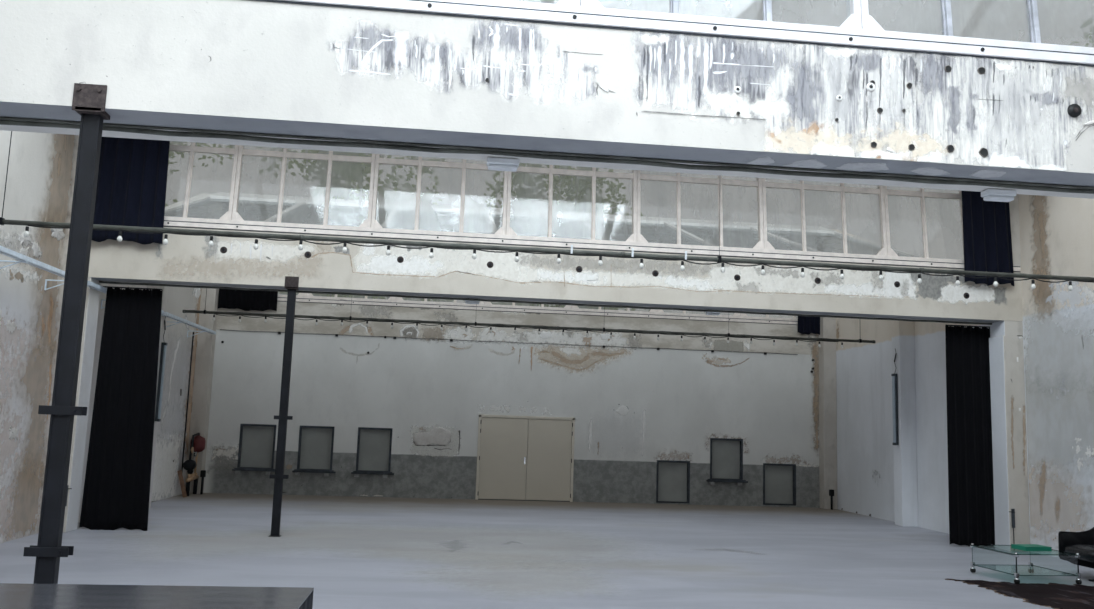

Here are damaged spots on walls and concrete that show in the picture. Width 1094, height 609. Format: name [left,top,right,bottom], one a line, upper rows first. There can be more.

peeling [396,33,408,64]
peeling [747,128,950,176]
peeling [970,169,1007,178]
peeling [216,240,916,298]
leakage [1033,195,1053,318]
leakage [8,134,74,538]